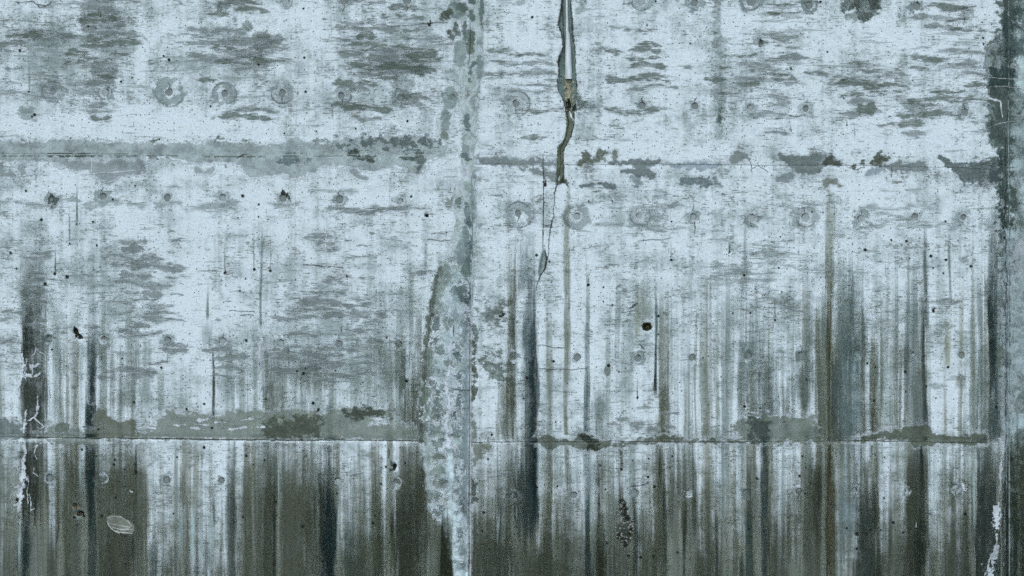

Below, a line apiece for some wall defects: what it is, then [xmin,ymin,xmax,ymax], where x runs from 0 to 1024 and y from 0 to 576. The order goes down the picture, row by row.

leakage [983,0,1021,377]
leakage [17,349,43,390]
leakage [0,396,420,512]
leakage [470,413,492,466]
leakage [536,410,820,455]
leakage [853,425,1000,469]
leakage [981,493,1002,576]